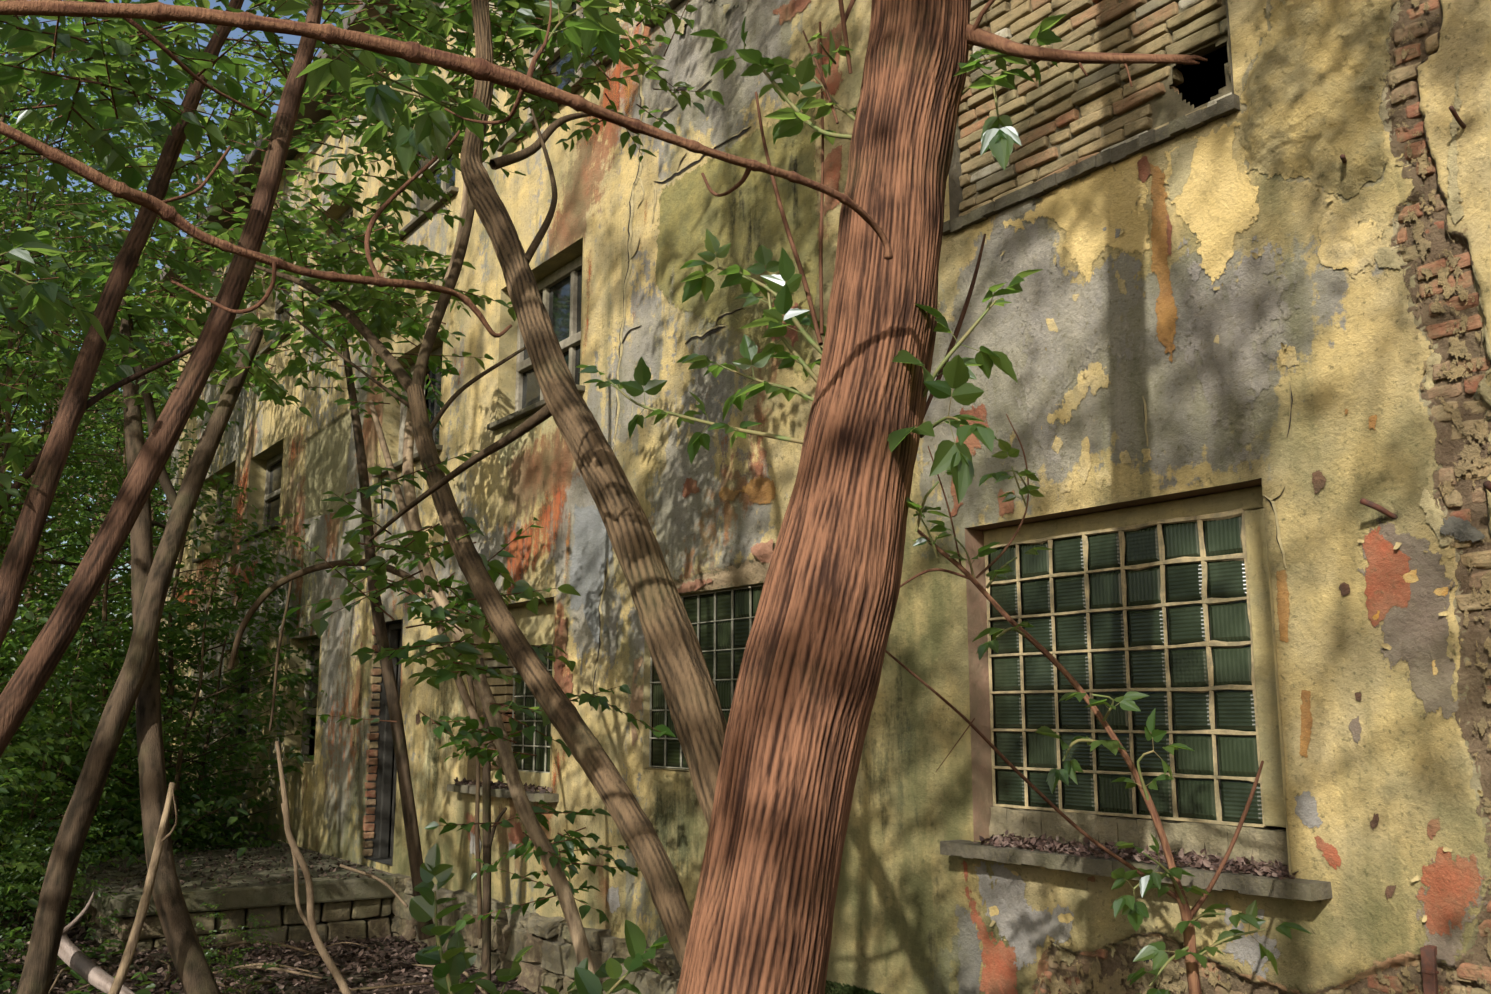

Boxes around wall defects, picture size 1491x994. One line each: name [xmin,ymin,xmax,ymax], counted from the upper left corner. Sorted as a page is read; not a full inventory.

peeling [712,0,748,15]
peeling [773,0,811,25]
peeling [815,21,843,99]
peeling [823,145,842,216]
rust [1137,156,1178,363]
peeling [719,464,776,505]
spalling [955,0,1491,994]
rust [504,485,569,602]